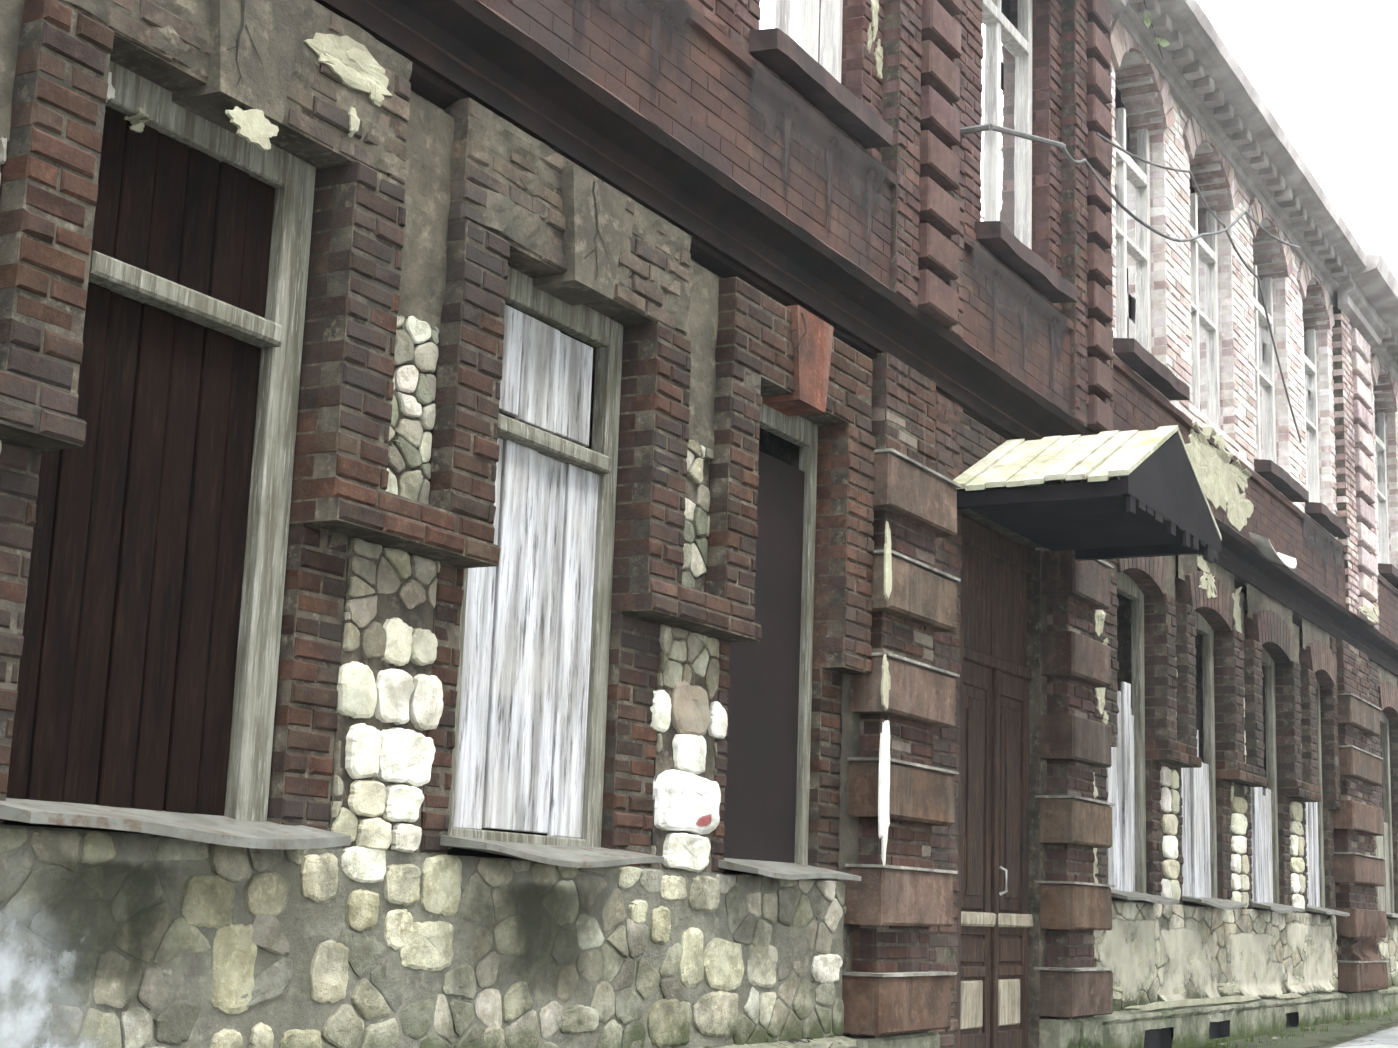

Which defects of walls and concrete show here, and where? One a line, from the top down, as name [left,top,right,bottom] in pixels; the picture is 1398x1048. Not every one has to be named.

peeling [106,72,115,102]
peeling [124,107,153,133]
crack [208,0,264,87]
peeling [225,106,279,151]
peeling [304,33,393,138]
leakage [748,61,889,253]
peeling [1185,420,1254,532]
peeling [1197,555,1242,633]